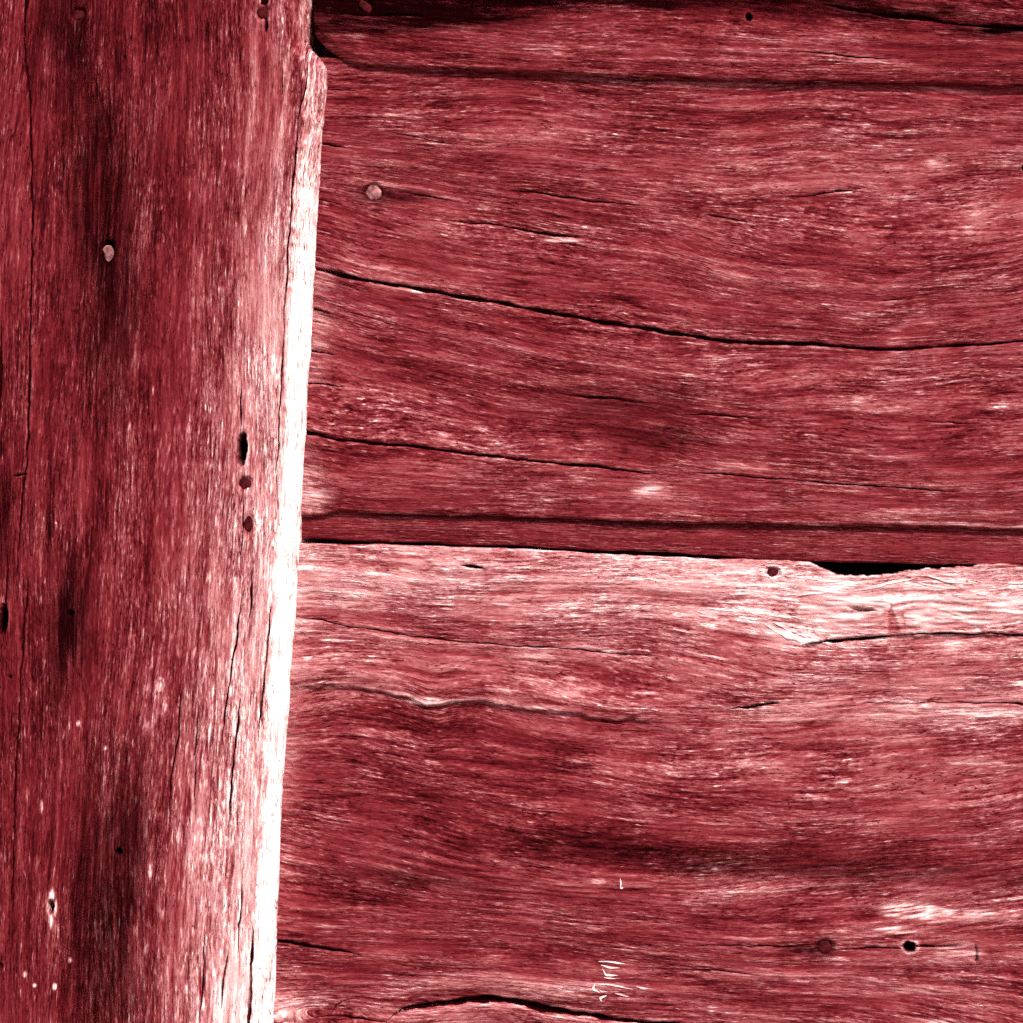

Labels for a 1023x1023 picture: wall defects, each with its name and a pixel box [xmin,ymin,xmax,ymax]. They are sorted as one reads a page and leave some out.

crack [399,191,583,238]
crack [510,190,635,206]
crack [790,187,867,199]
crack [274,51,356,500]
crack [315,268,1023,351]
crack [5,0,34,900]
crack [306,431,656,474]
crack [692,473,948,492]
crack [199,860,359,1023]
crack [685,944,811,975]
crack [841,945,978,963]
crack [314,995,679,1023]